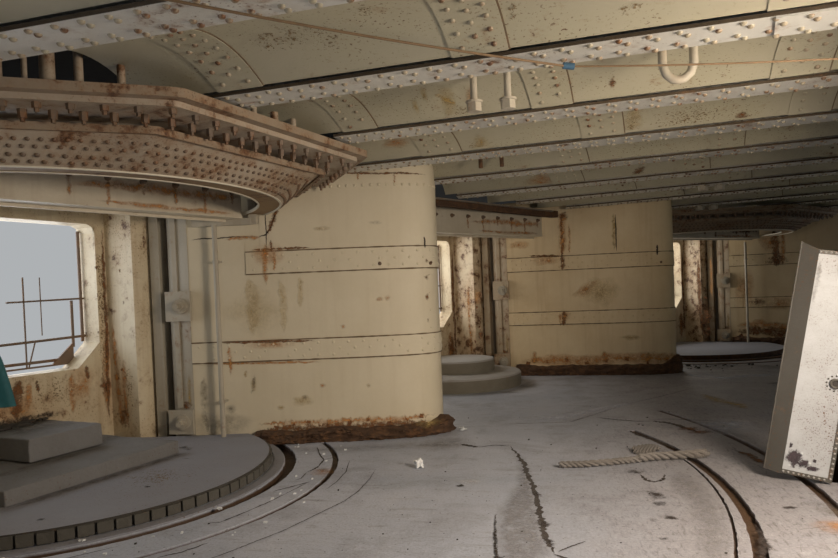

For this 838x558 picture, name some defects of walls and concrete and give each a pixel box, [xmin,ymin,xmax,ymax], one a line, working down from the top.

rust [91,182,233,213]
rust [254,240,307,279]
rust [531,212,570,269]
rust [95,234,135,426]
rust [739,322,787,337]
rust [0,367,90,425]
crack [461,444,585,558]